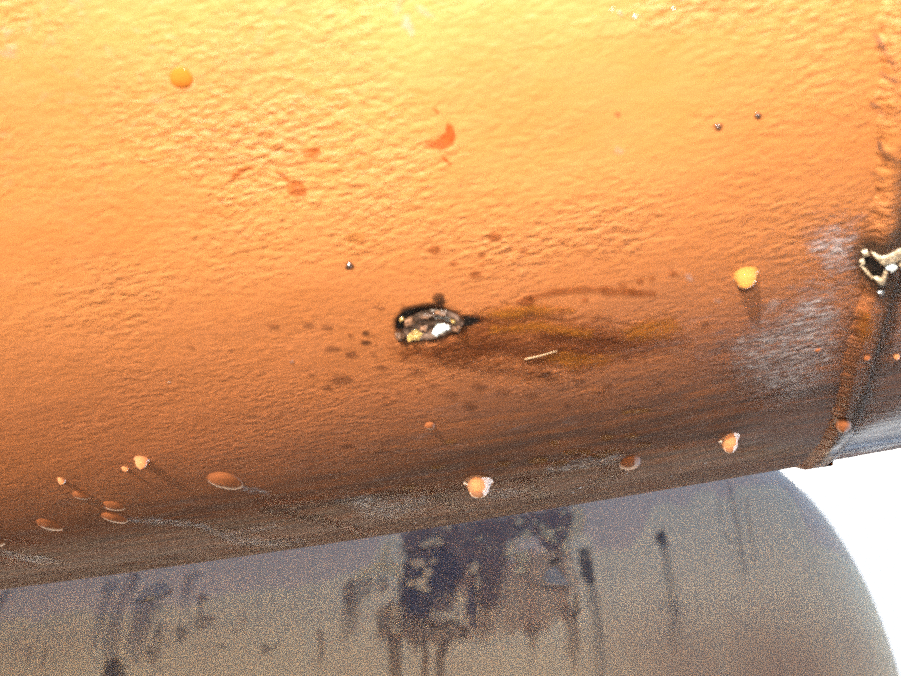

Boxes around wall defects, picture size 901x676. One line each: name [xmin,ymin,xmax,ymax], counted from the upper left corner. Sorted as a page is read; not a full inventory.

rust [436,123,455,164]
peeling [856,235,901,298]